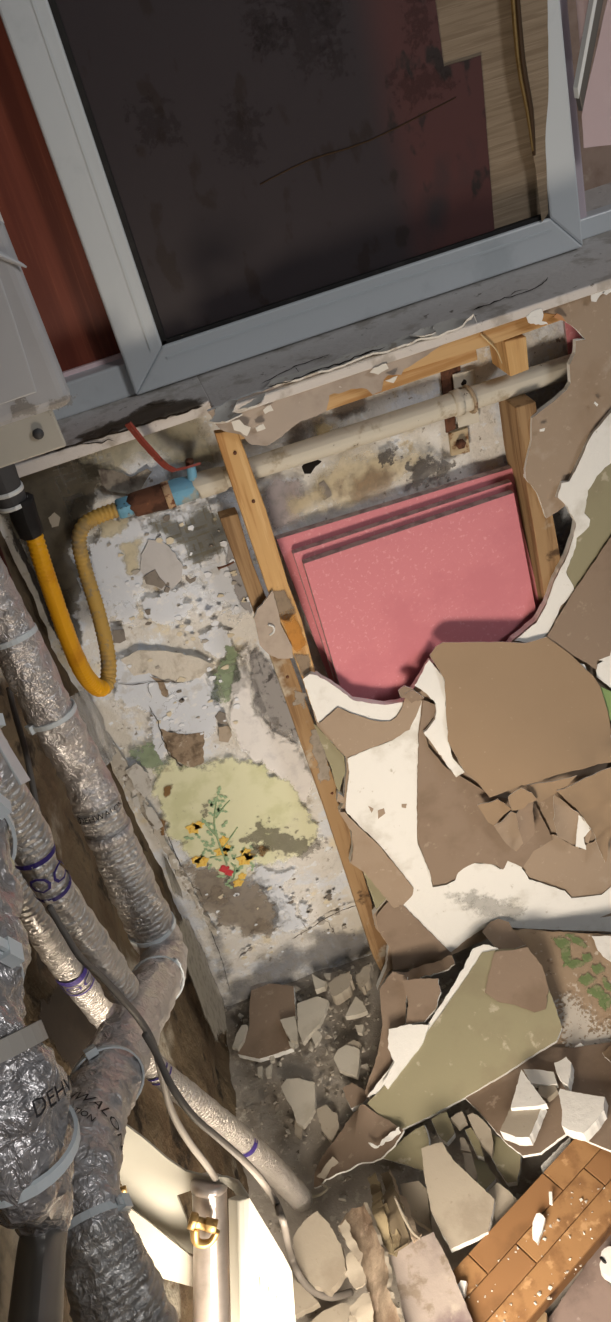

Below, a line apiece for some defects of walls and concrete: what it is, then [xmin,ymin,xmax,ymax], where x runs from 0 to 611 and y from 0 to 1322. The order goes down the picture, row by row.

peeling [209,314,477,436]
spalling [302,460,322,474]
water stain [264,446,456,529]
peeling [87,494,262,767]
peeling [109,741,347,960]
spalling [427,945,498,1032]
spalling [367,1061,394,1097]